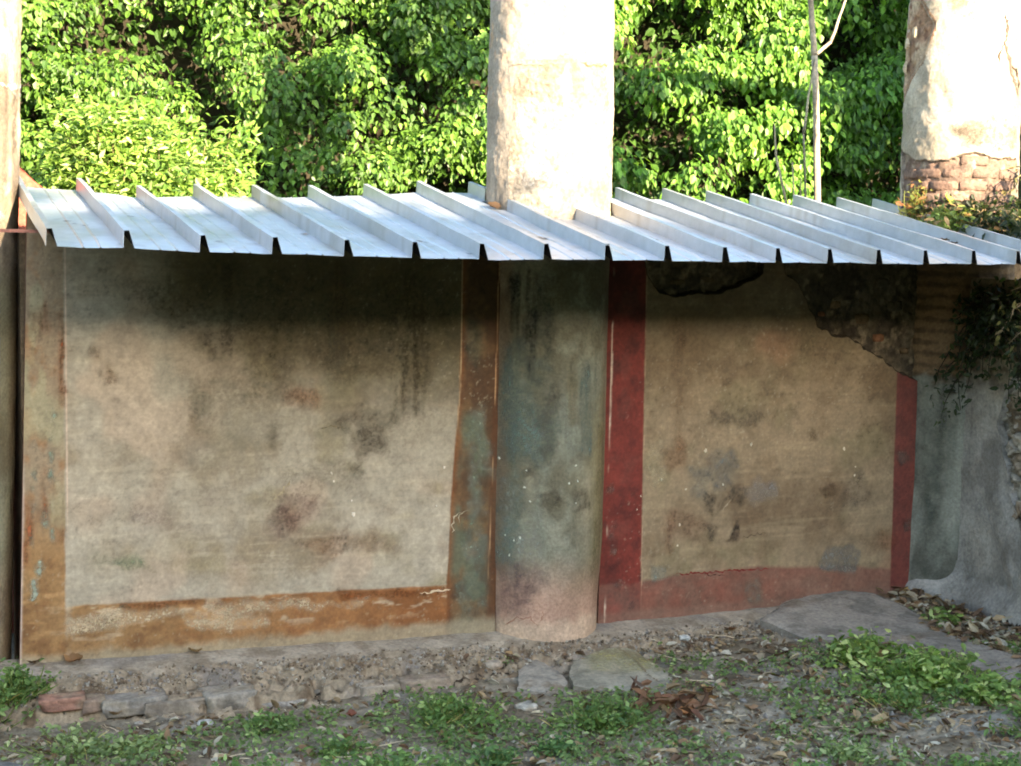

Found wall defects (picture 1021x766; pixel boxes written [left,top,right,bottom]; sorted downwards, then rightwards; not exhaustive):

crack [998,15,1020,98]
spalling [784,260,918,382]